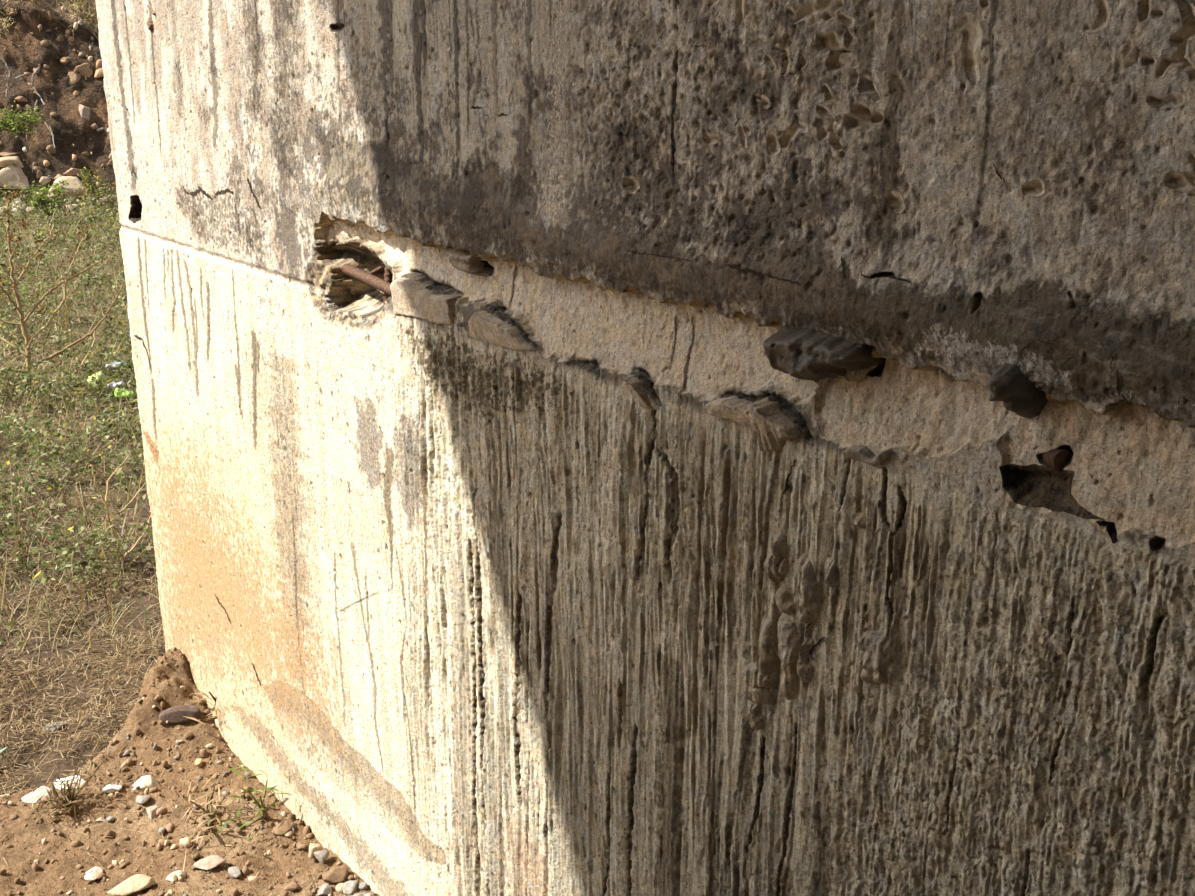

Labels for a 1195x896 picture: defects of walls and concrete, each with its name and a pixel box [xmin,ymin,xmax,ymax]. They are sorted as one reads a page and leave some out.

crack [183,178,260,209]
leakage [242,0,1195,441]
leakage [137,238,157,439]
leakage [163,248,210,395]
spalling [307,212,1195,555]
leakage [232,269,446,864]
leakage [485,504,503,647]
leakage [233,707,411,896]